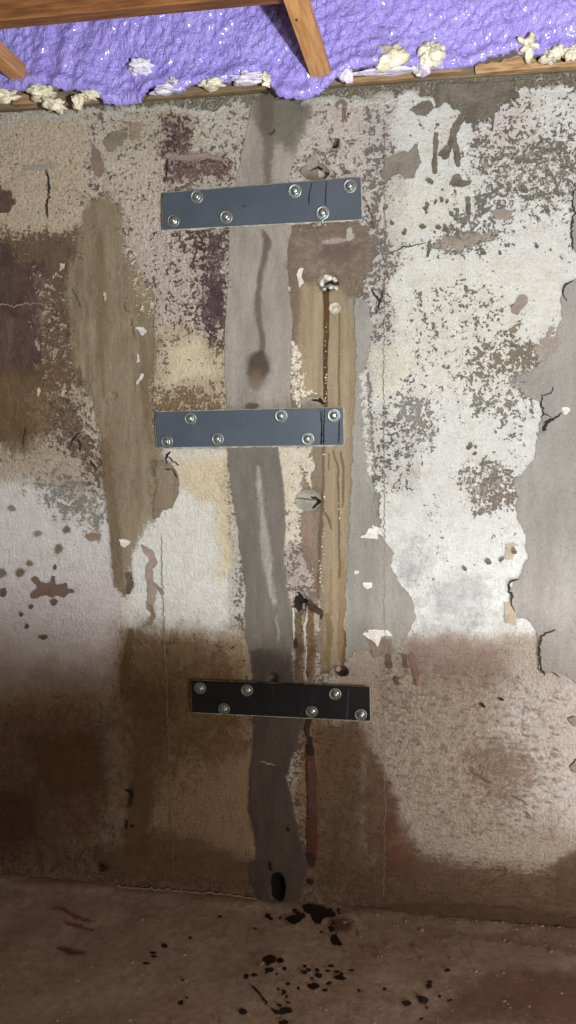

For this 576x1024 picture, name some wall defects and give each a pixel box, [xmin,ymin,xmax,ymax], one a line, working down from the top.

peeling [380,78,520,257]
damp [0,193,171,595]
corrosion [323,291,341,407]
crack [540,388,561,431]
peeling [119,539,163,626]
peeling [151,460,180,522]
damp [228,447,294,684]
peeling [336,279,576,846]
crack [508,579,519,611]
crack [538,630,560,678]
corrosion [305,719,318,868]
damp [104,624,576,954]